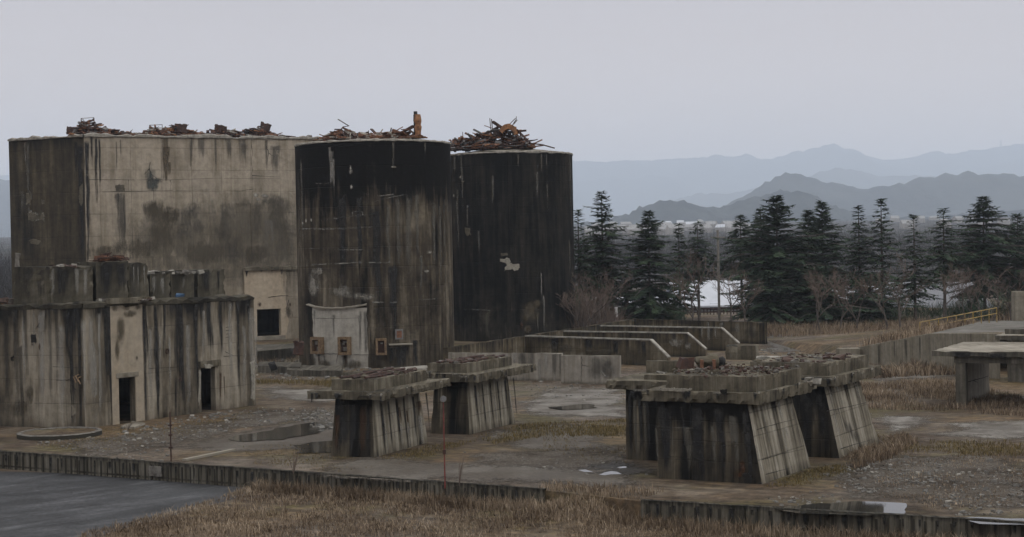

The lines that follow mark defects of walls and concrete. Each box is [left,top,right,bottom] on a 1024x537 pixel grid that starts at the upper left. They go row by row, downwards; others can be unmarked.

leakage [74,137,230,414]
leakage [254,156,468,331]
spalling [500,253,520,271]
leakage [64,301,82,422]
leakage [236,300,250,380]